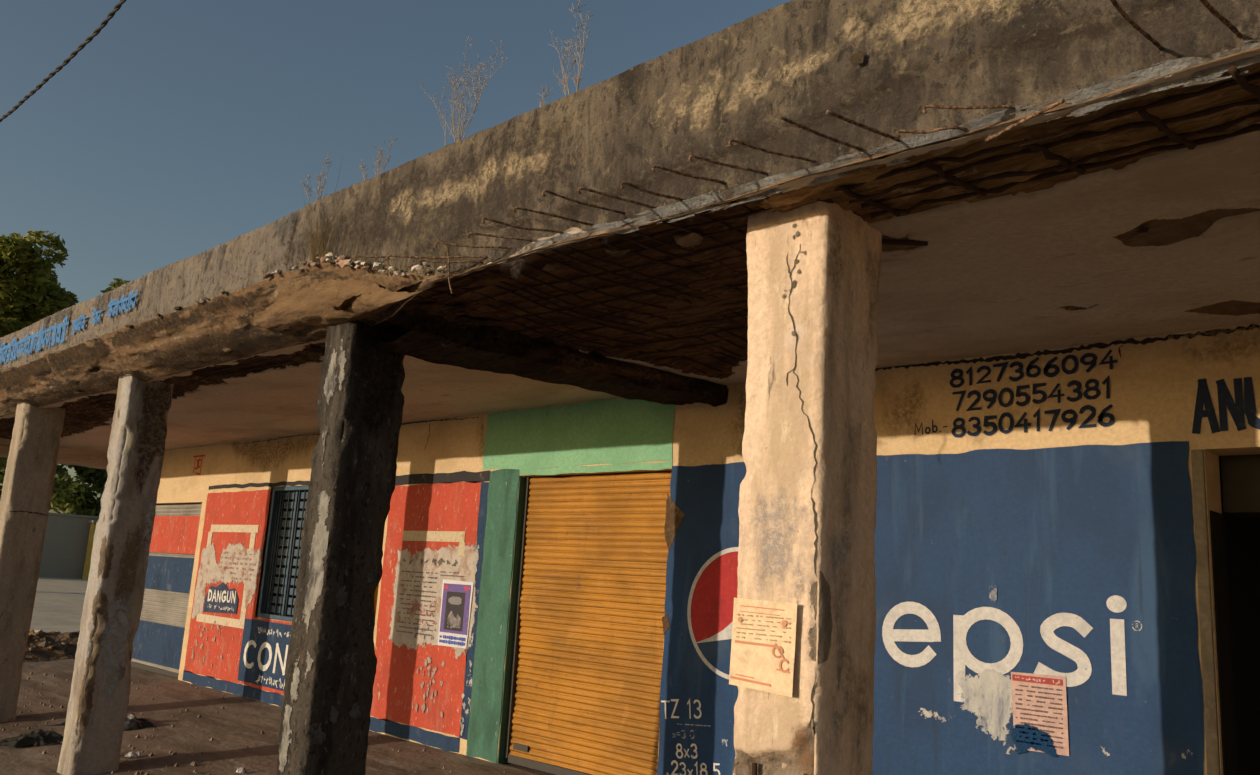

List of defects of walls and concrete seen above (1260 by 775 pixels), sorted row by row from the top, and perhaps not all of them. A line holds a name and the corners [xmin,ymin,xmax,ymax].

leakage [275,69,942,271]
spalling [263,0,1260,379]
spalling [0,412,15,440]
spalling [44,388,118,441]
spalling [153,338,346,405]
crack [782,224,818,577]
peeling [302,490,331,633]
peeling [278,642,361,774]
peeling [459,608,475,735]
crack [807,683,815,729]
spalling [808,571,833,664]
peeling [918,669,1015,754]